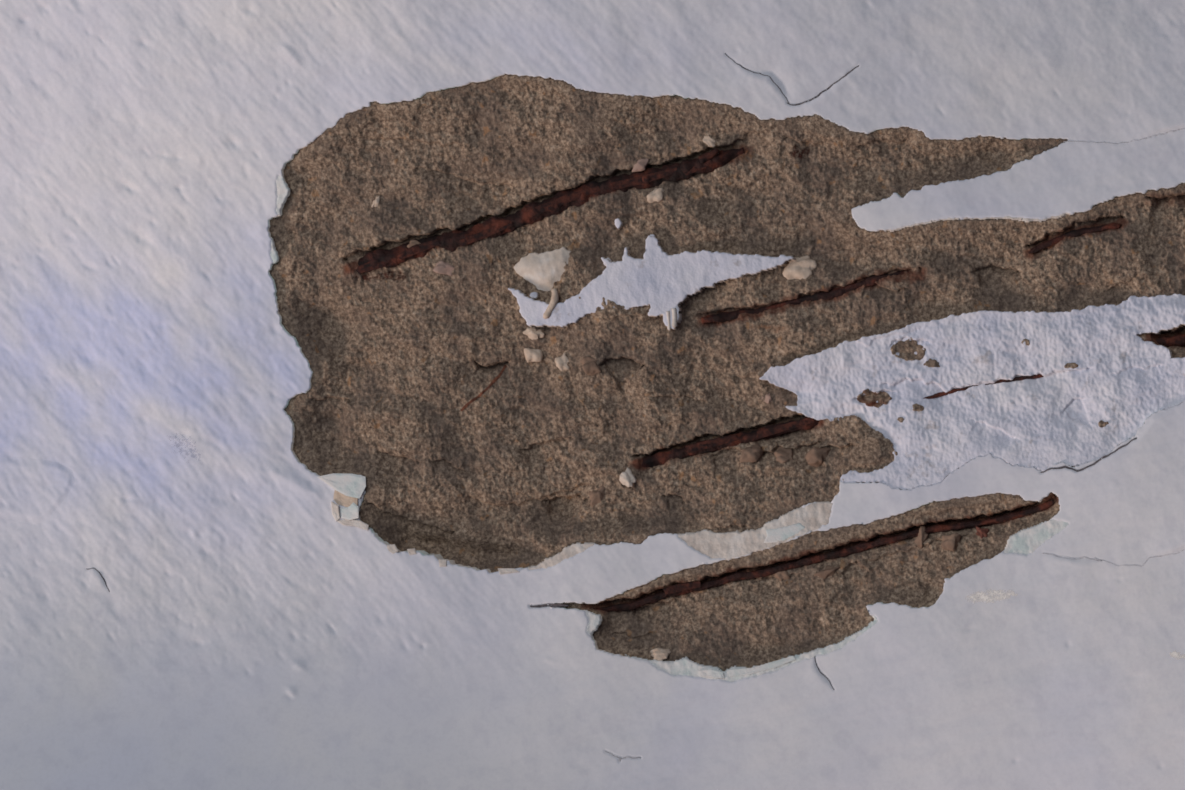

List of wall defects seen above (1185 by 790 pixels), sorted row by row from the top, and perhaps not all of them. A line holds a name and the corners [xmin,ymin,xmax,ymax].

spalling [269,74,1185,682]
crack [726,55,859,106]